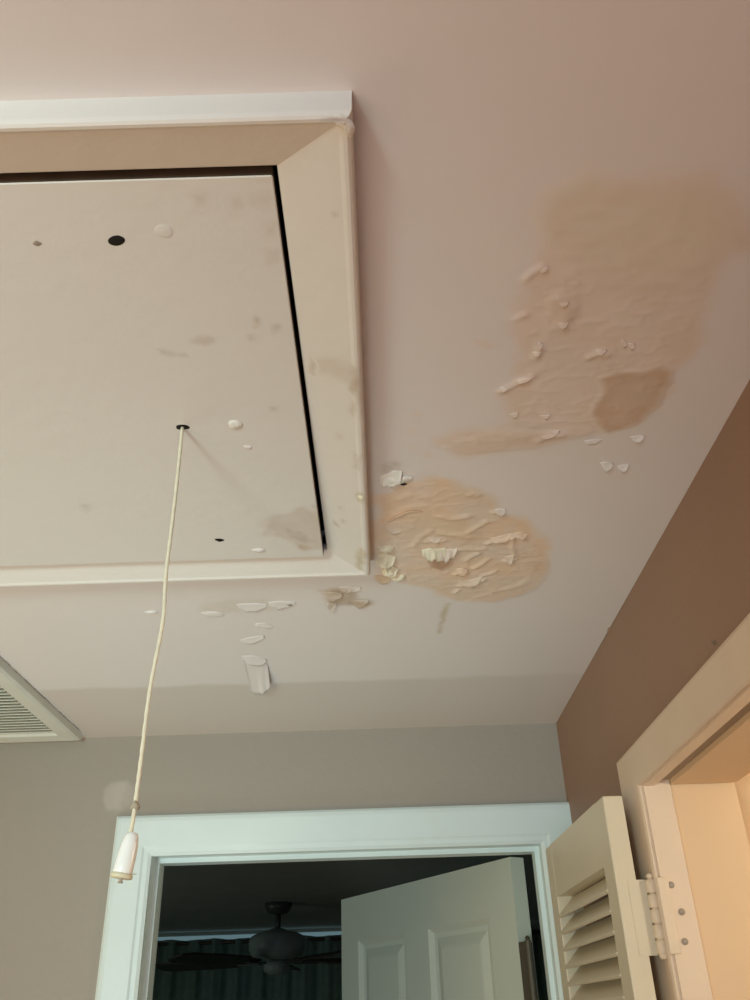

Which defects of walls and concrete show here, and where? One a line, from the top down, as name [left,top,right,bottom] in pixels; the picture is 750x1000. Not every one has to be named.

water stain [352,148,750,634]
peeling [236,601,296,695]